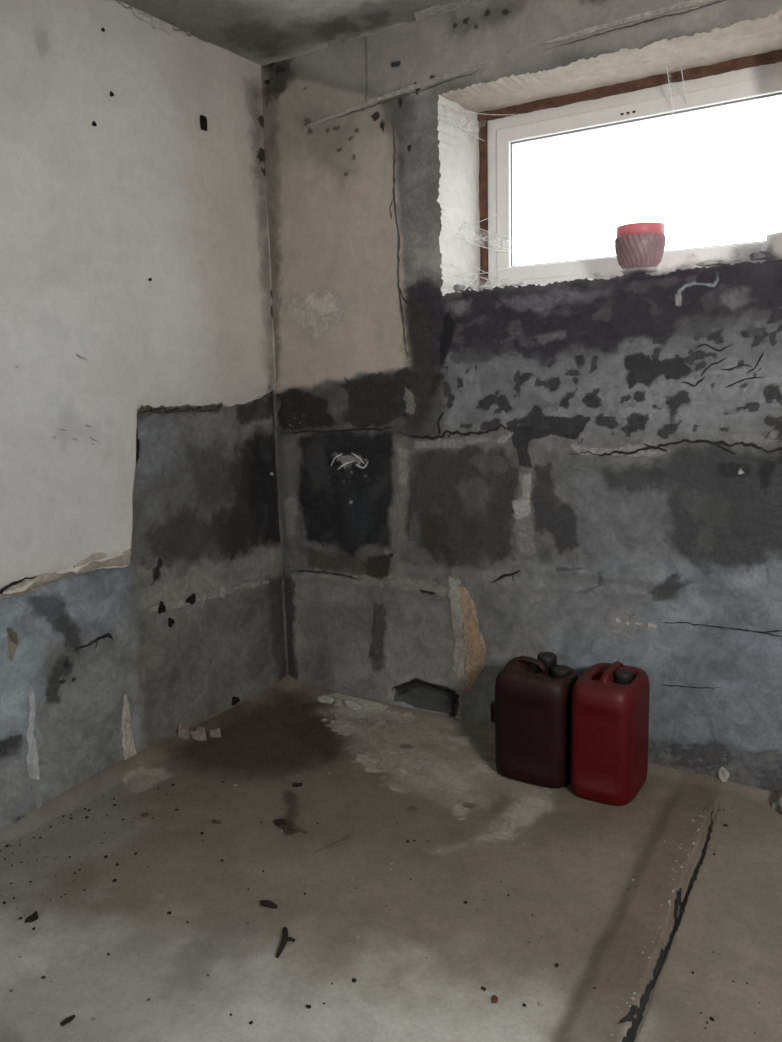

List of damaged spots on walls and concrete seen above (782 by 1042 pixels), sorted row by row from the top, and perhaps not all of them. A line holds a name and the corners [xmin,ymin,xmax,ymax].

spalling [442,365,478,408]
spalling [448,310,782,468]
peeling [136,403,229,466]
crack [569,433,782,457]
peeling [0,549,131,597]
spalling [393,678,460,717]
crack [619,806,714,1042]